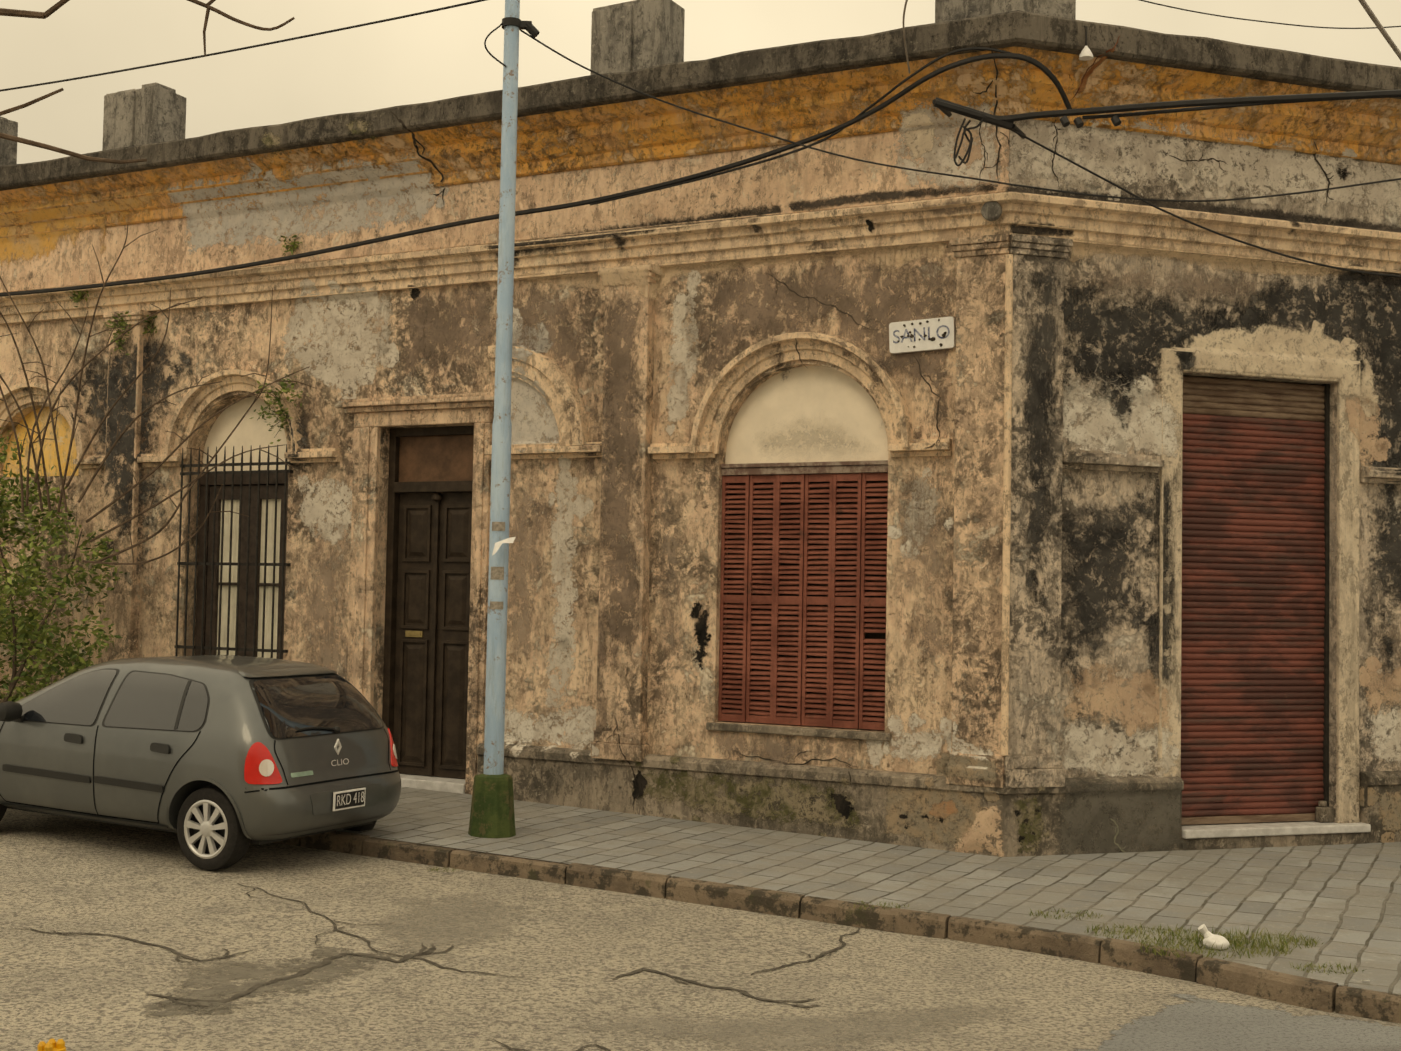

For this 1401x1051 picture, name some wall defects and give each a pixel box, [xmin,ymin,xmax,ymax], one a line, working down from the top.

flaking render [167,156,449,255]
damp [61,339,193,573]
damp [1013,262,1401,718]
flaking render [1061,663,1180,779]
flaking render [1359,656,1401,766]
spalling [1356,786,1401,843]
crack [10,928,252,963]
crack [146,883,523,1006]
crack [611,927,860,1010]
crack [486,1037,530,1051]
crack [576,1043,650,1051]